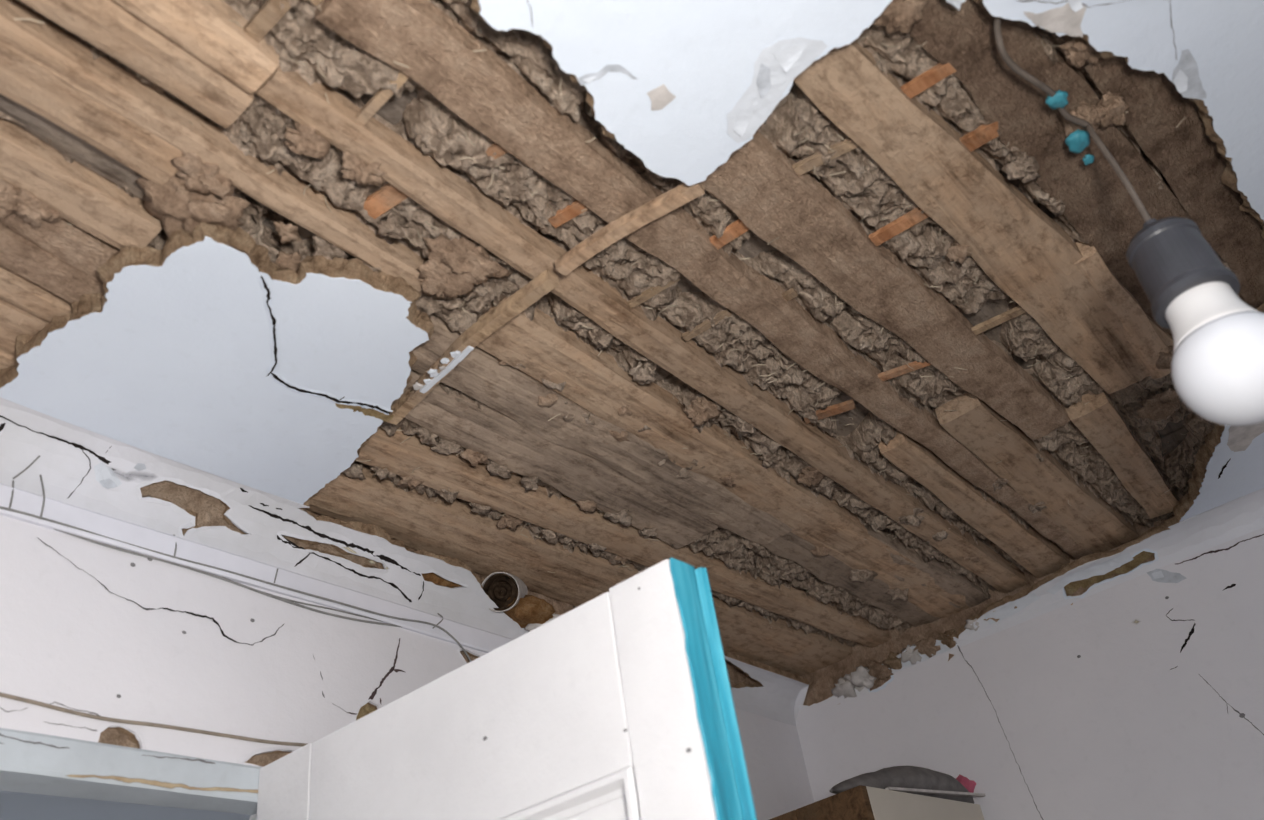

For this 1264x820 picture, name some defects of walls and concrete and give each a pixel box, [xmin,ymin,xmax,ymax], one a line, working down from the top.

peeling [1024,0,1086,37]
peeling [727,37,828,143]
peeling [1172,49,1206,99]
crack [256,275,394,422]
crack [0,415,115,499]
flaking render [94,462,252,540]
crack [37,537,285,645]
spalling [800,515,1187,706]
crack [1176,534,1264,564]
crack [313,639,405,715]
spalling [725,661,755,687]
crack [1166,609,1264,735]